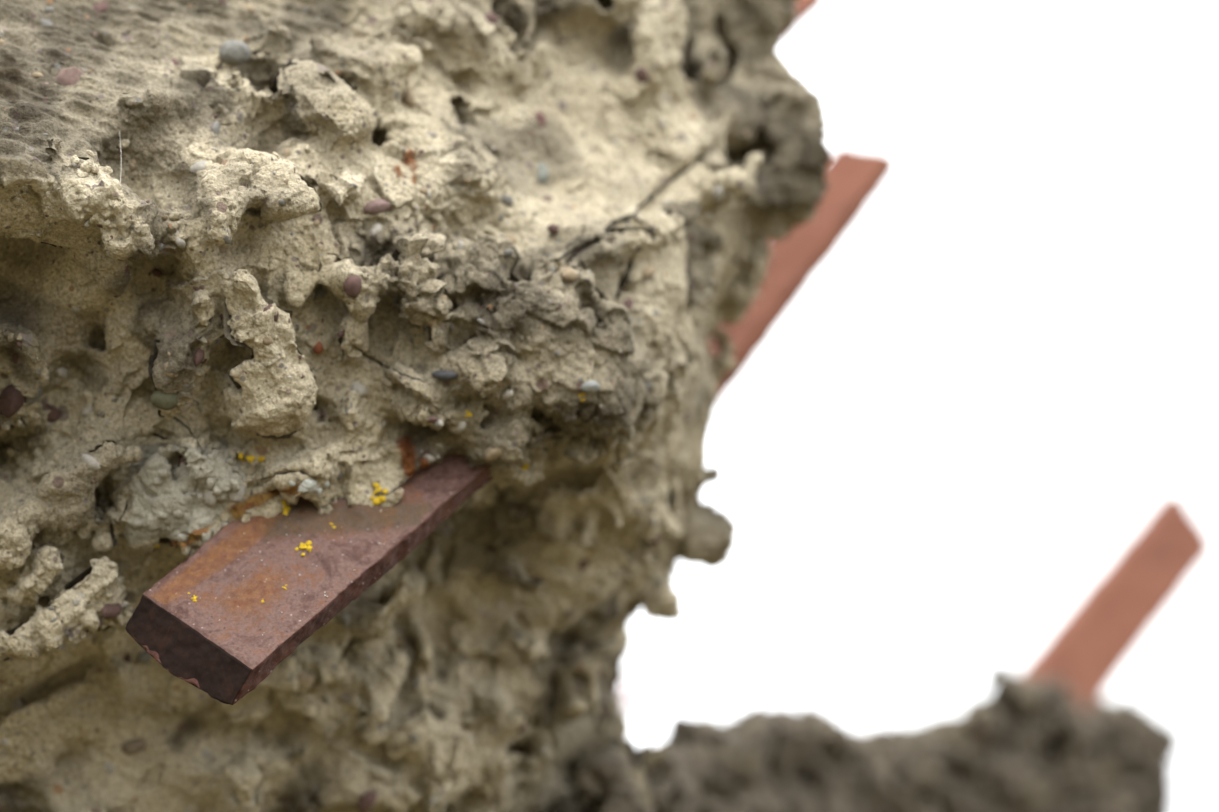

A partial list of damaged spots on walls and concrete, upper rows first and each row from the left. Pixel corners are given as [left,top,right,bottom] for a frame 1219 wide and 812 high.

spalling [480,0,559,61]
spalling [670,0,719,101]
spalling [241,49,318,168]
spalling [0,119,180,469]
spalling [180,220,294,280]
corrosion [152,527,209,550]
spalling [119,438,246,543]
corrosion [230,484,302,520]
spalling [519,448,610,502]
spalling [75,686,215,785]